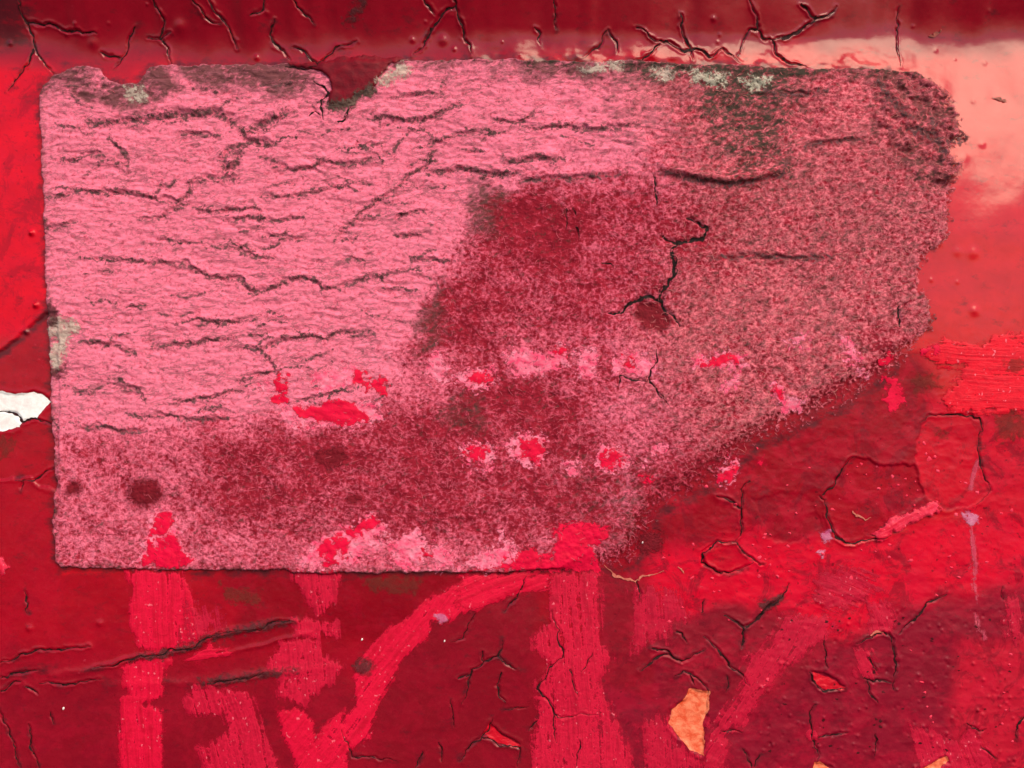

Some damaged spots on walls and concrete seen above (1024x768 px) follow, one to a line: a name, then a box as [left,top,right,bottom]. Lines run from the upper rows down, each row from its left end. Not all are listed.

crack [8,0,172,90]
crack [192,0,355,123]
crack [580,0,836,66]
crack [608,218,709,327]
peeling [604,565,662,582]
crack [701,481,764,574]
peeling [872,501,943,542]
crack [0,620,291,766]
crack [341,614,600,768]
peeling [669,688,710,756]
crack [641,584,789,693]
crack [809,594,947,757]